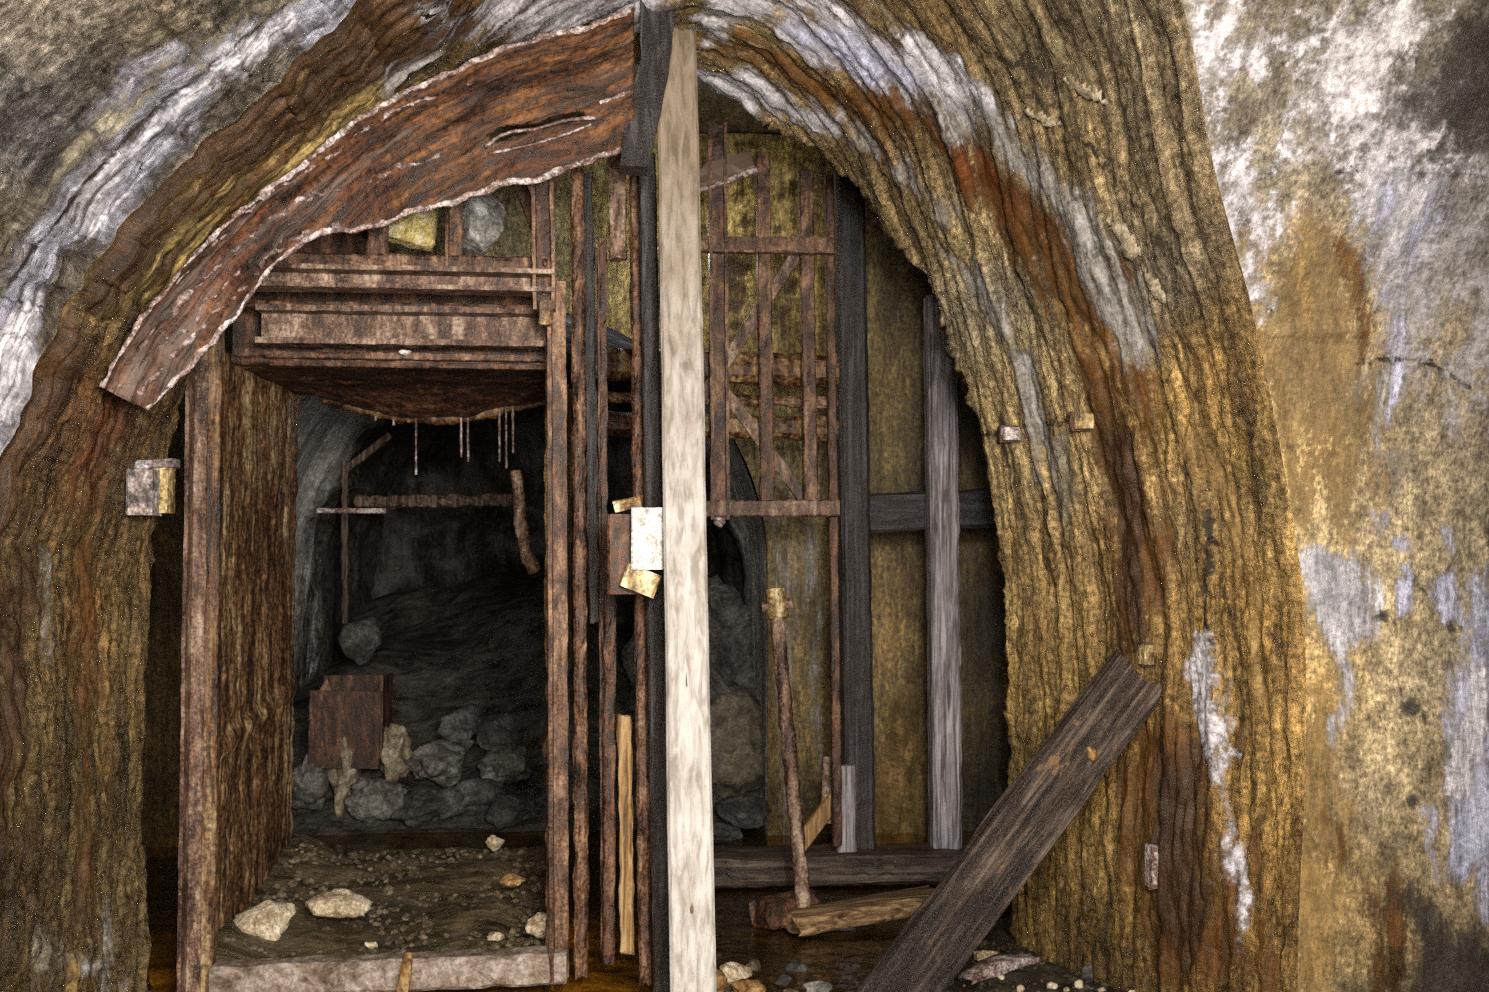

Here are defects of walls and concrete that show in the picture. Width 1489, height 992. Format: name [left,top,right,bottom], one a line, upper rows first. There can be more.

corrosion [696,28,1174,661]
leakage [1188,0,1489,473]
crack [1354,356,1489,389]
leakage [1185,631,1253,930]
leakage [1298,512,1413,745]
leakage [1391,528,1489,992]